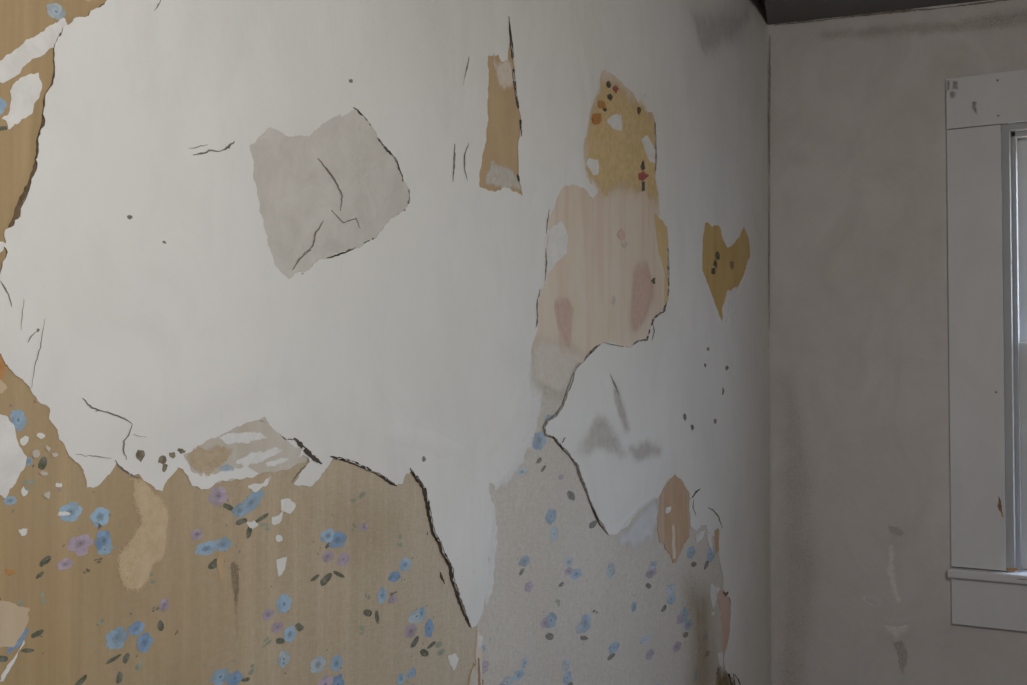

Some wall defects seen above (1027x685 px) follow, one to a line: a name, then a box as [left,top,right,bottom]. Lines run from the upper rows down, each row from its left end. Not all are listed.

peeling [0,18,67,129]
peeling [479,43,522,194]
flaking render [249,110,408,279]
peeling [529,69,669,403]
peeling [702,222,750,324]
peeling [0,414,59,498]
flaking render [158,417,308,492]
peeling [115,476,170,593]
peeling [244,498,296,542]
peeling [276,557,287,577]
peeling [657,475,719,563]
peeling [0,599,30,682]